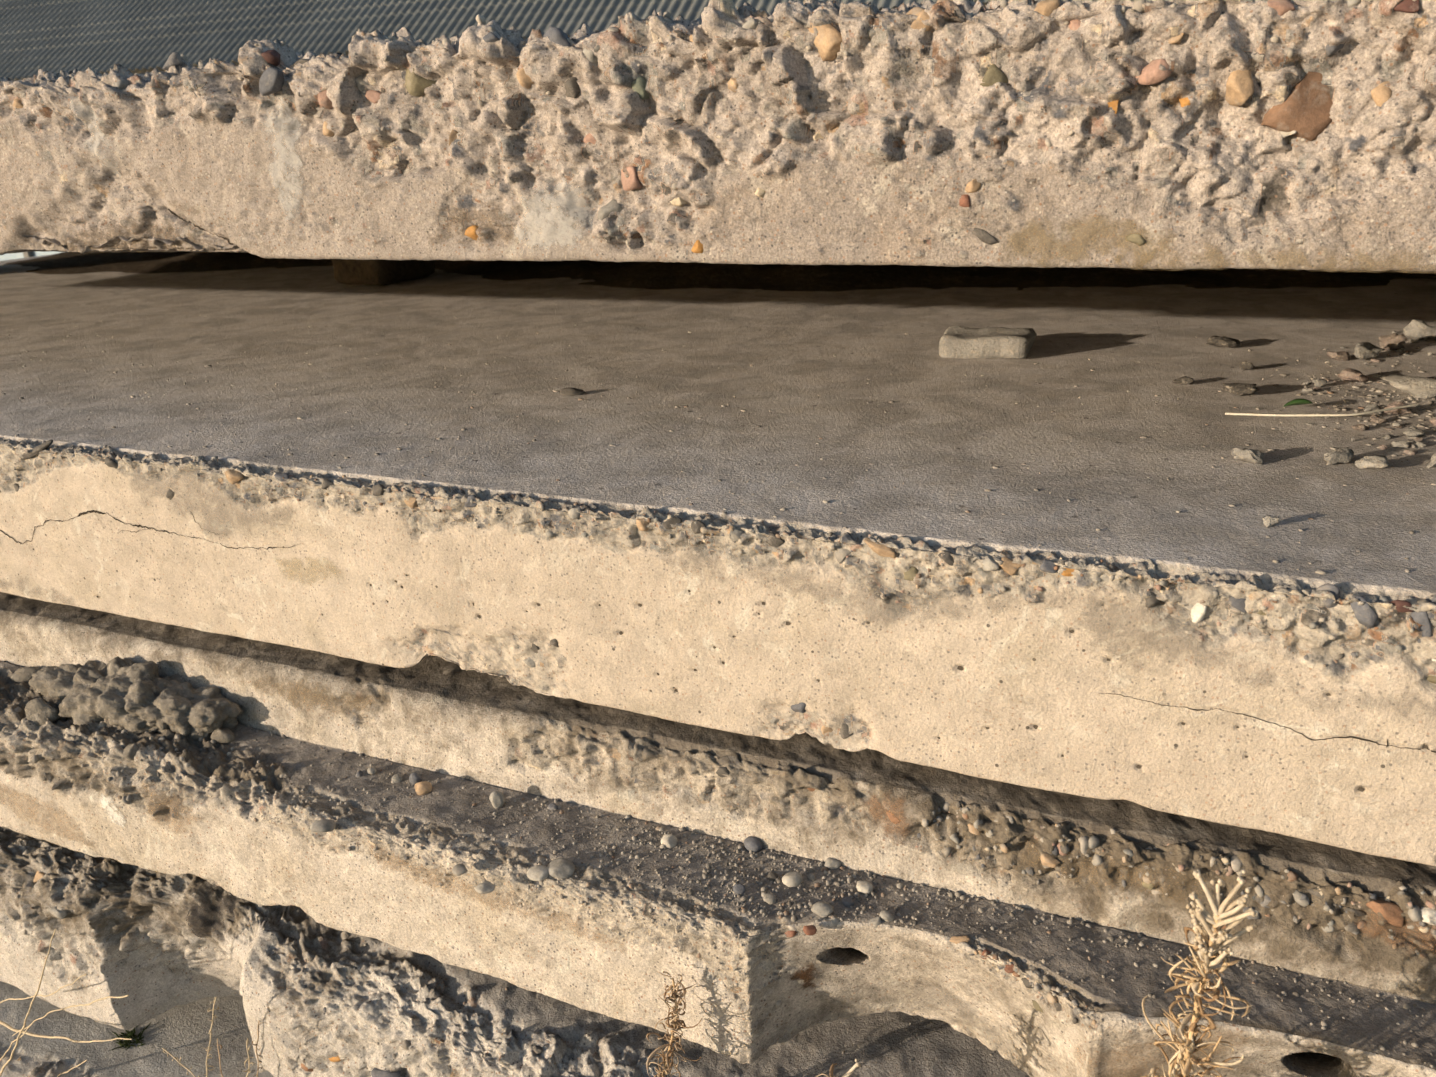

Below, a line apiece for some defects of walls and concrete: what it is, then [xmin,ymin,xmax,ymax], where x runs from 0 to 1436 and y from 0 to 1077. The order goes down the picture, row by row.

spalling [0,0,1436,254]
crack [0,510,301,550]
spalling [0,437,1436,697]
crack [1103,693,1436,753]
spalling [0,667,797,1077]
corrosion [791,965,816,989]
spalling [950,935,1107,1034]